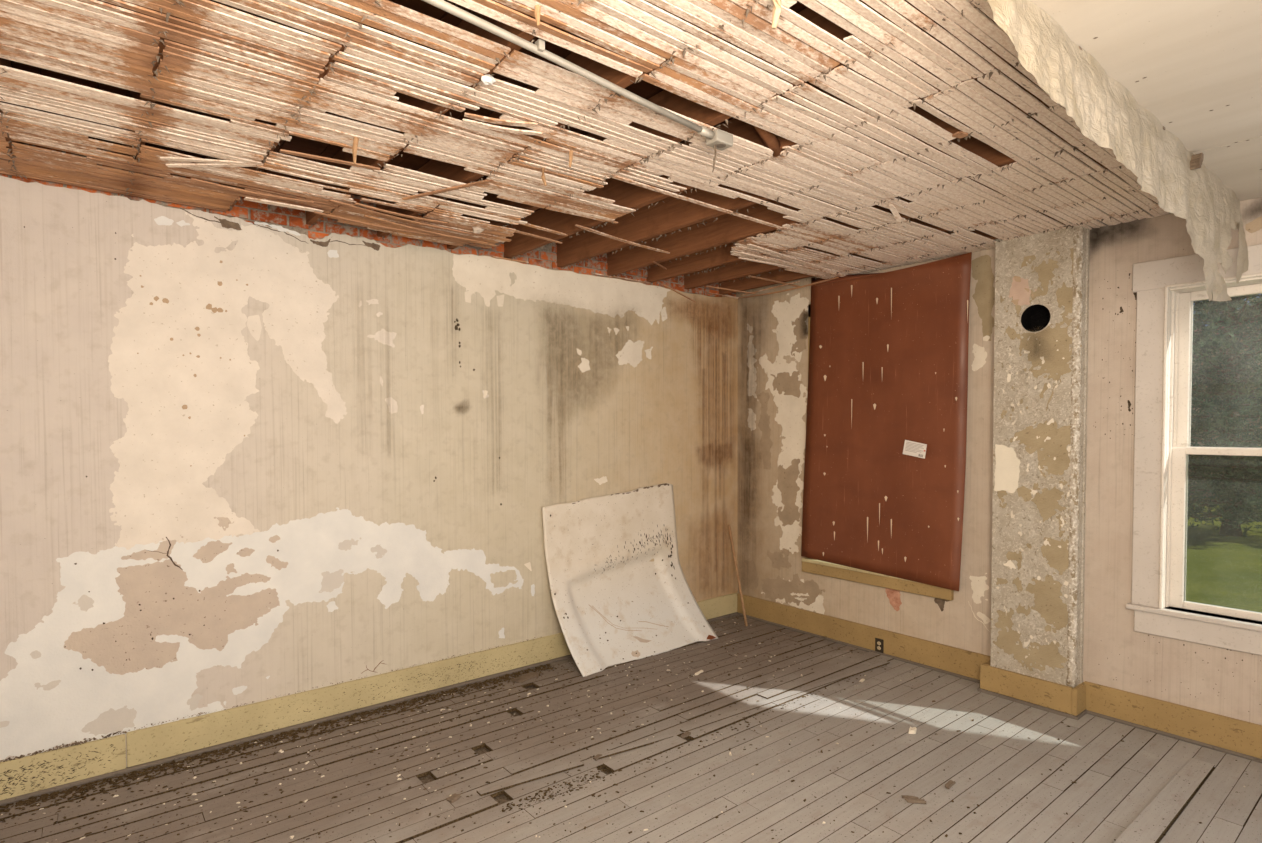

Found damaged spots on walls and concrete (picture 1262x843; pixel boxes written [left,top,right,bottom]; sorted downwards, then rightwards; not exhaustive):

peeling [0,212,535,762]
peeling [452,254,670,368]
peeling [576,349,590,373]
peeling [594,476,669,495]
peeling [739,293,825,614]
peeling [969,248,1082,671]